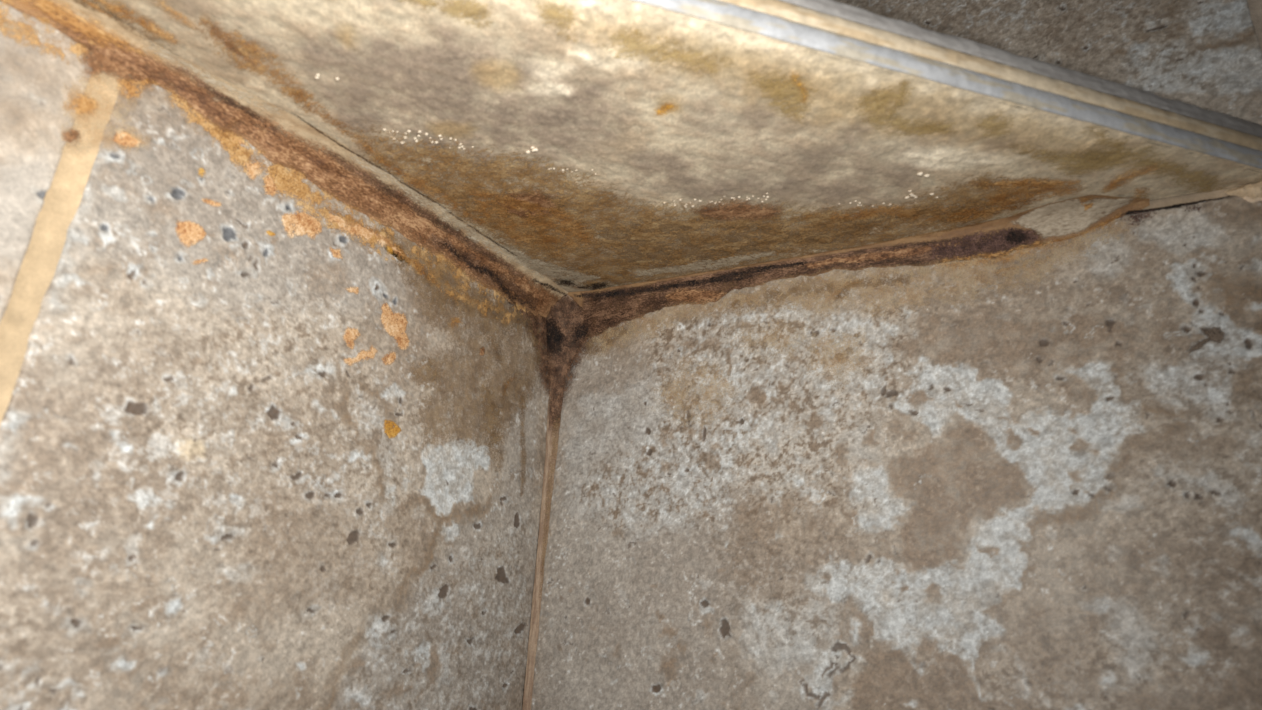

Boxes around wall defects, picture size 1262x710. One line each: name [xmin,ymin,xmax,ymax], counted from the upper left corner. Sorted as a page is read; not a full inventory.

leakage [411,0,486,25]
leakage [859,82,951,135]
leakage [383,129,474,150]
leakage [1022,126,1222,192]
rust [0,0,1121,430]
leakage [663,193,769,208]
mould [929,227,1039,260]
leakage [557,261,807,298]
leakage [546,313,589,357]